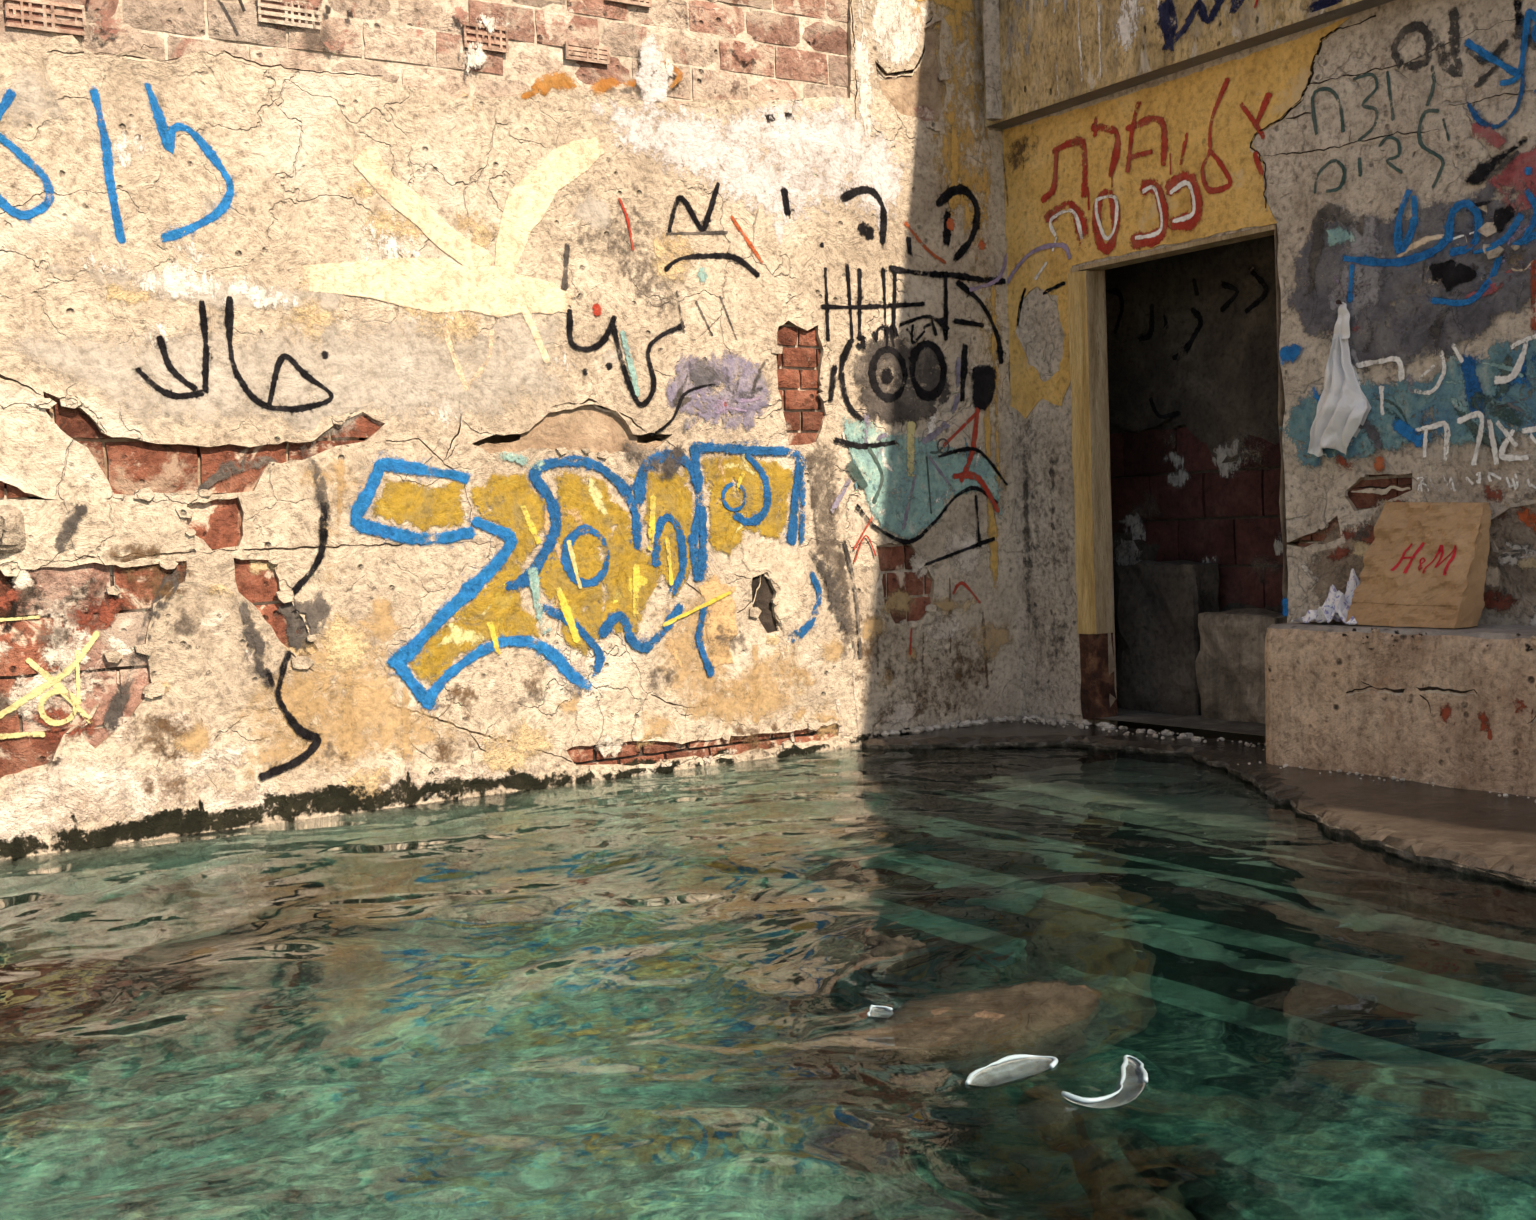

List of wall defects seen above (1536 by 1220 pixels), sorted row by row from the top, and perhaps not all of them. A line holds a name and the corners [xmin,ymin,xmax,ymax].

crack [46,44,180,64]
crack [223,50,383,79]
crack [0,374,47,398]
spalling [771,322,828,445]
spalling [0,481,37,500]
crack [38,401,502,562]
spalling [35,392,383,669]
spalling [0,558,186,778]
leakage [0,545,588,843]
crack [1346,681,1477,713]
leakage [595,717,670,773]
flaking render [567,719,836,765]